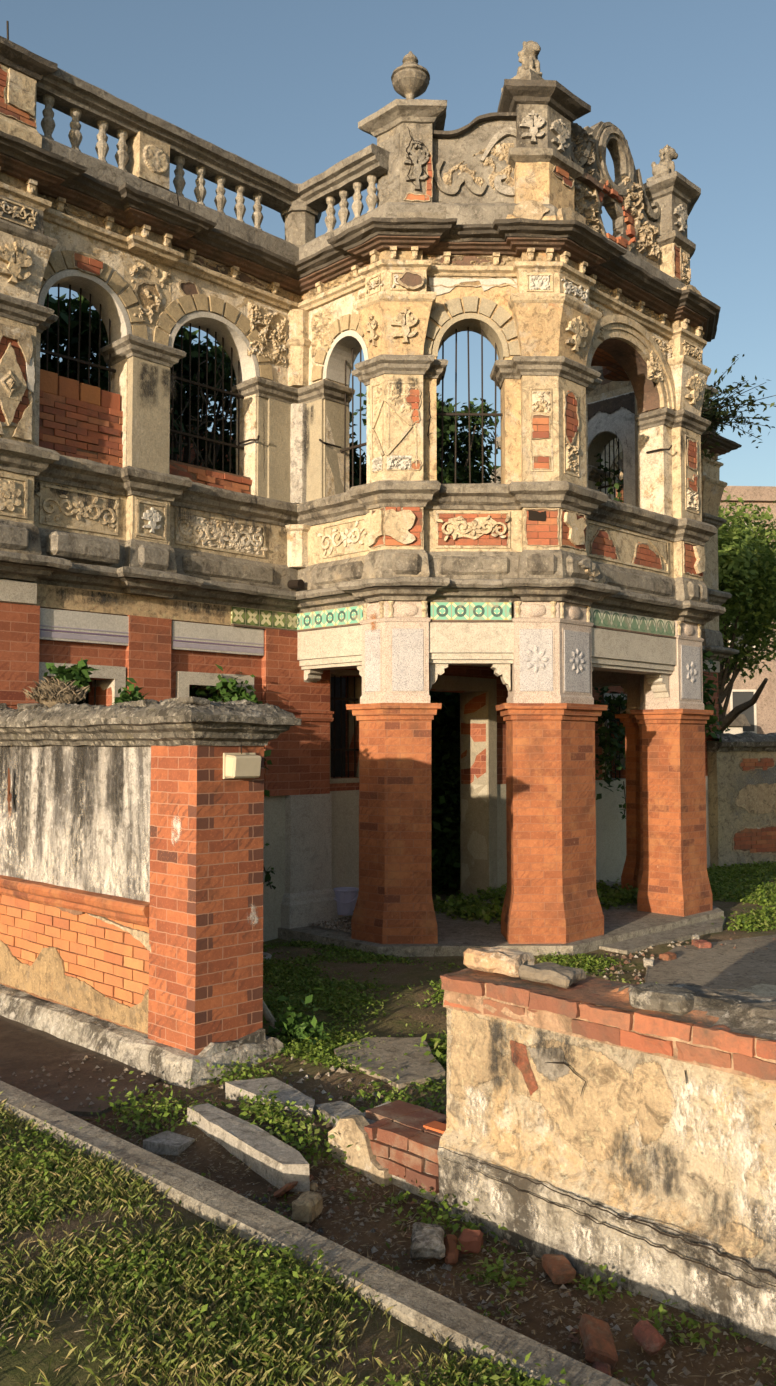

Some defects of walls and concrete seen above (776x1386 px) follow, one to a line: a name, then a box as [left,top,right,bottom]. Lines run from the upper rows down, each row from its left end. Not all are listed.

flaking render [0,65,37,129]
spalling [512,177,641,251]
flaking render [371,507,663,570]
leakage [0,745,122,880]
flaking render [732,756,776,855]
leakage [91,856,148,894]
leakage [466,1023,518,1131]
leakage [536,1031,574,1062]
flaking render [449,1009,677,1163]
leakage [437,1154,505,1211]
crack [438,1147,776,1296]
leakage [611,1080,776,1326]